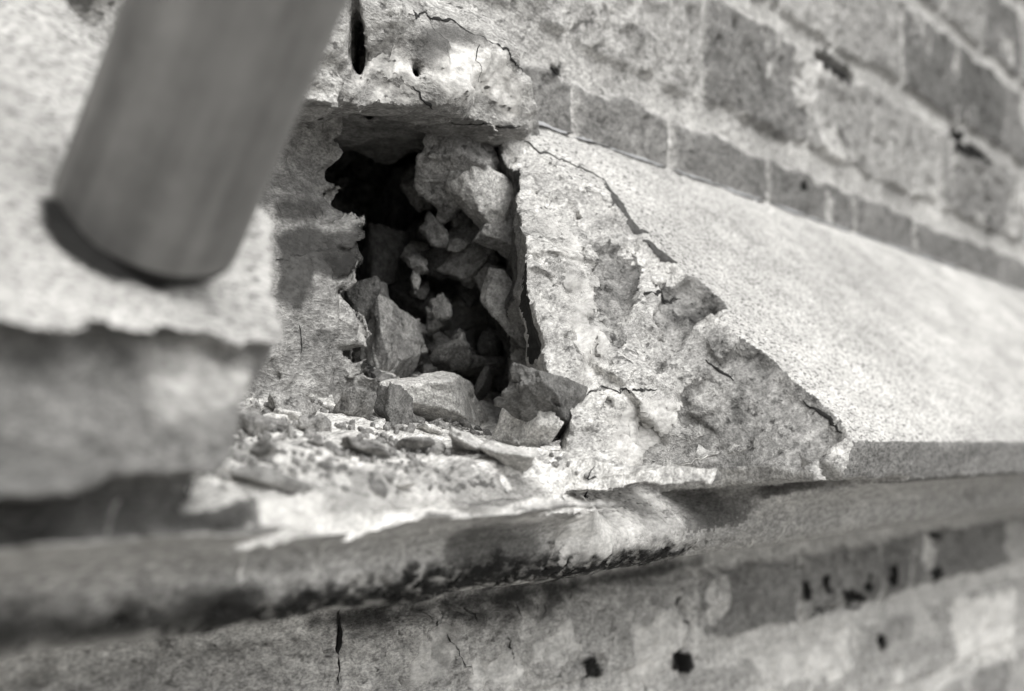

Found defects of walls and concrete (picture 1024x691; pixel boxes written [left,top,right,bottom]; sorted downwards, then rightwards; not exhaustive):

crack [409,11,523,82]
spalling [822,48,852,84]
crack [413,87,678,263]
spalling [0,116,854,552]
crack [335,616,343,684]